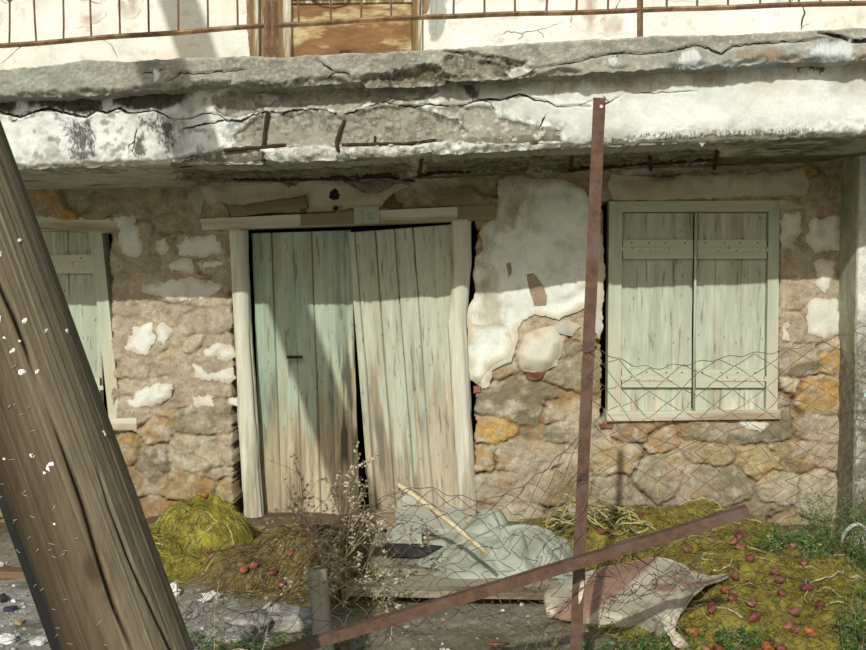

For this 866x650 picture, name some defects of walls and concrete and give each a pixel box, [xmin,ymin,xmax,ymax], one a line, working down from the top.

crack [544,0,866,68]
crack [141,69,248,81]
crack [319,61,350,79]
water stain [0,99,102,165]
water stain [113,79,316,155]
crack [0,90,695,153]
peeling [172,50,591,389]
peeling [141,234,225,301]
peeling [595,222,605,339]
peeling [779,212,841,341]
peeling [125,322,174,355]
peeling [127,383,173,408]